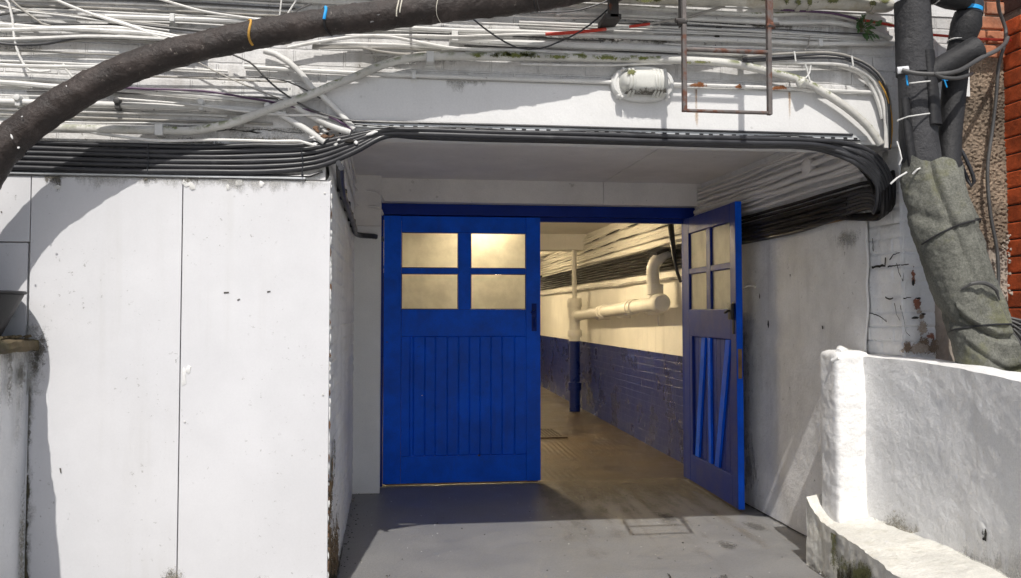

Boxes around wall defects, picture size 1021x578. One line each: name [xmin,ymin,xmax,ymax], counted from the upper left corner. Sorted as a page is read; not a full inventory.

peeling [986,234,1013,308]
spalling [901,297,955,362]
water stain [7,334,47,578]